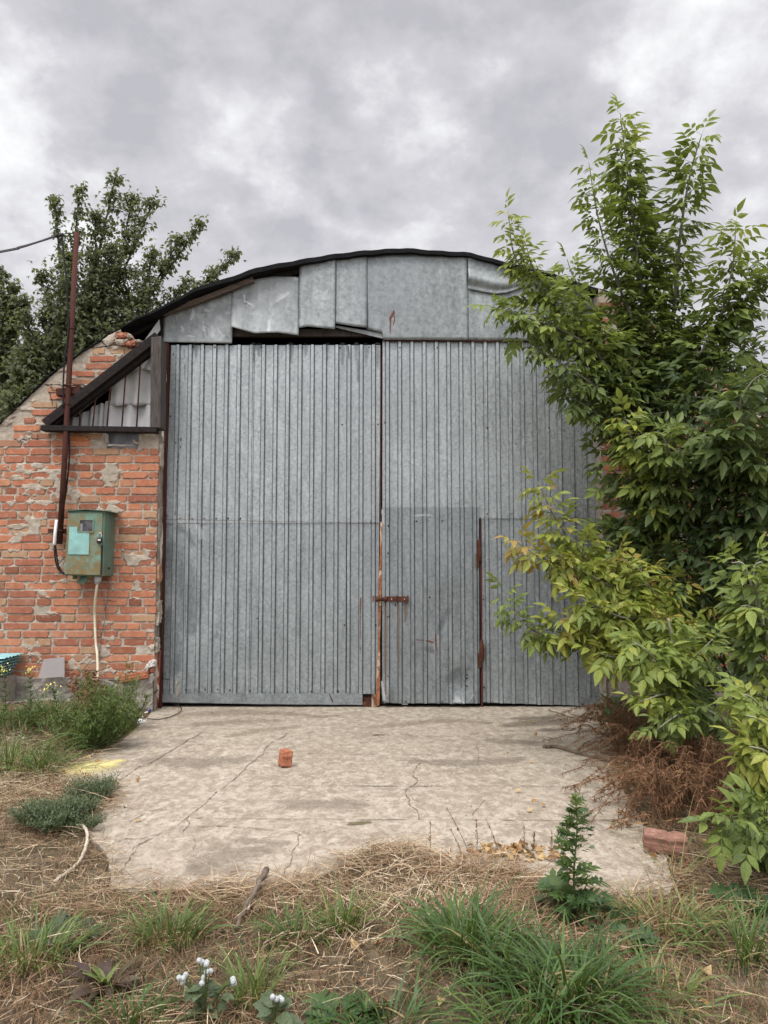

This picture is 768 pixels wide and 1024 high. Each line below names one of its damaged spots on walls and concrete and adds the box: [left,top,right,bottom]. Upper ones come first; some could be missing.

spalling [142,507,163,681]
crack [99,736,284,874]
crack [232,818,300,881]
crack [356,736,448,820]